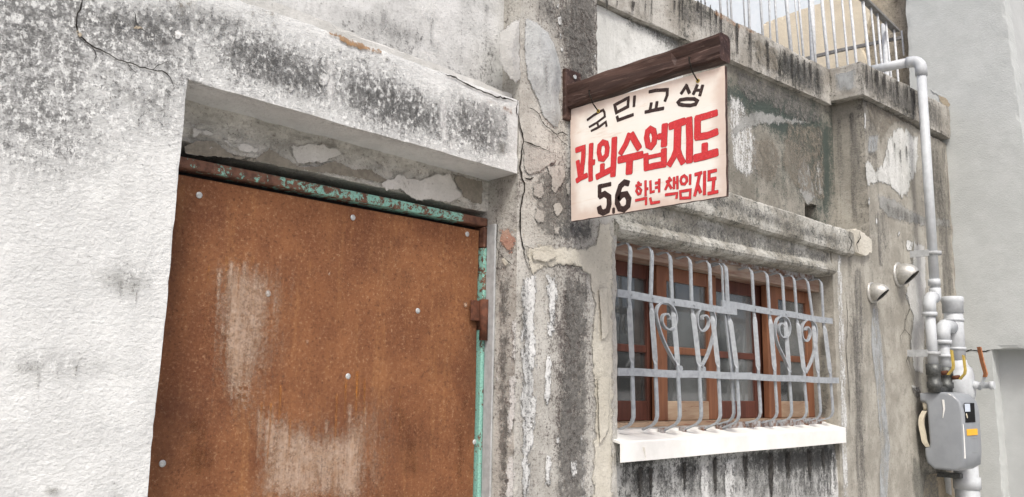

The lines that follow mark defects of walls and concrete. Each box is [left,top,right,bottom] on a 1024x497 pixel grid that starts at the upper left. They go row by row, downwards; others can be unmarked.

crack [76,0,175,88]
damp [97,1,448,140]
spalling [329,28,390,61]
damp [674,0,853,96]
flaking render [185,124,483,205]
crack [445,74,568,277]
peeling [865,128,918,204]
flaking render [500,229,516,266]
peeling [495,250,558,497]
damp [556,277,590,497]
damp [629,198,865,497]